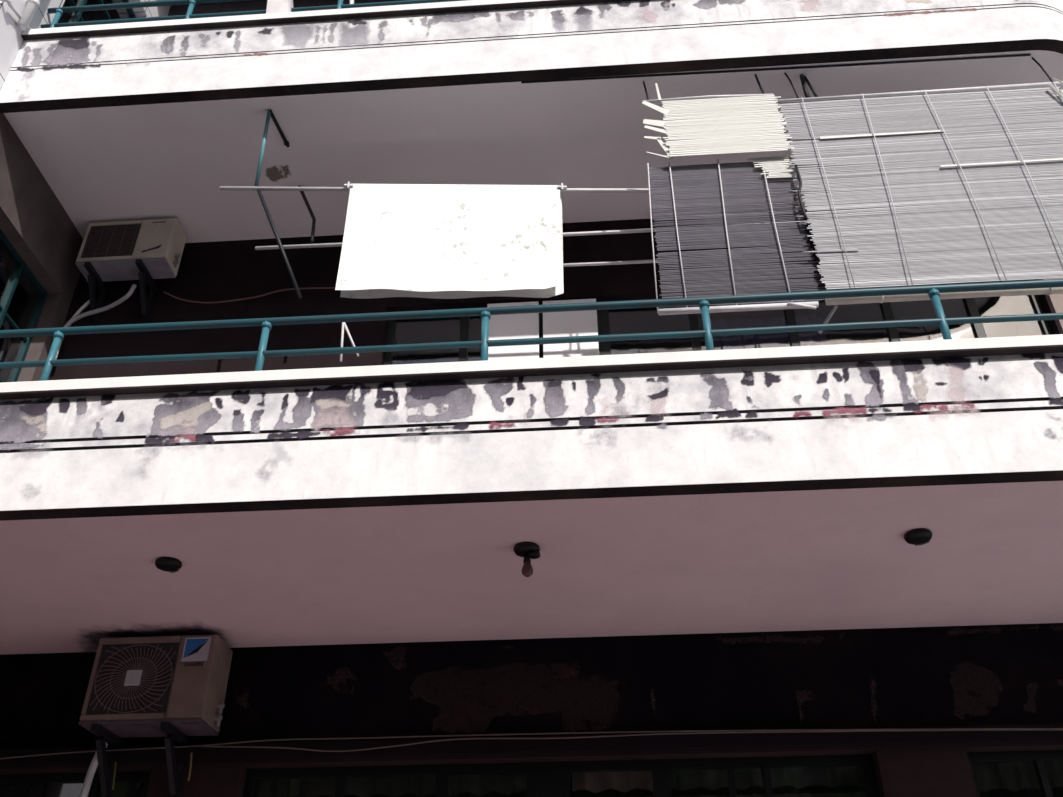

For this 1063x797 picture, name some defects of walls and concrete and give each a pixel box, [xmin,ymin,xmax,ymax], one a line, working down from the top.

peeling [17,37,102,71]
peeling [161,31,267,56]
peeling [258,19,387,47]
peeling [409,10,534,35]
peeling [550,0,675,30]
peeling [693,0,745,9]
peeling [0,397,87,450]
peeling [145,373,625,451]
peeling [646,376,669,428]
peeling [700,371,781,419]
peeling [817,357,989,421]
peeling [1021,353,1063,405]